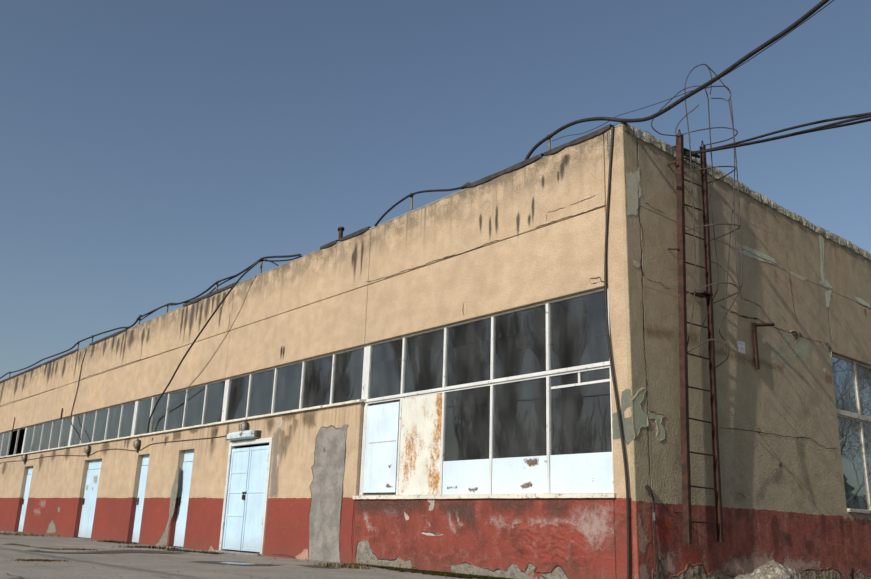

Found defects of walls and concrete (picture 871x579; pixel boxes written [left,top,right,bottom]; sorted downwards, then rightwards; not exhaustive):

peeling [626,167,642,216]
leakage [180,292,226,334]
leakage [92,328,150,357]
leakage [44,351,81,382]
peeling [630,387,666,443]
crack [724,428,839,449]
spalling [355,539,416,569]
peeling [637,513,842,579]
spalling [449,561,571,579]